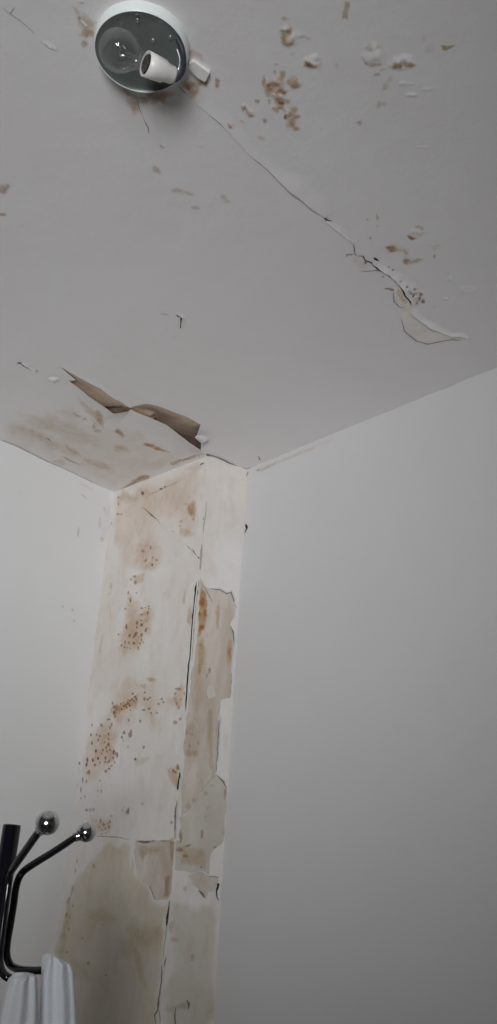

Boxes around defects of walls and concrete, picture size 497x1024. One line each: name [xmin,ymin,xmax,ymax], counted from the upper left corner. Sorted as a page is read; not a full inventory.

crack [346,254,421,307]
peeling [384,285,470,345]
peeling [47,363,208,457]
crack [144,482,207,709]
peeling [129,578,239,900]
crack [173,773,181,838]
crack [154,900,176,1024]